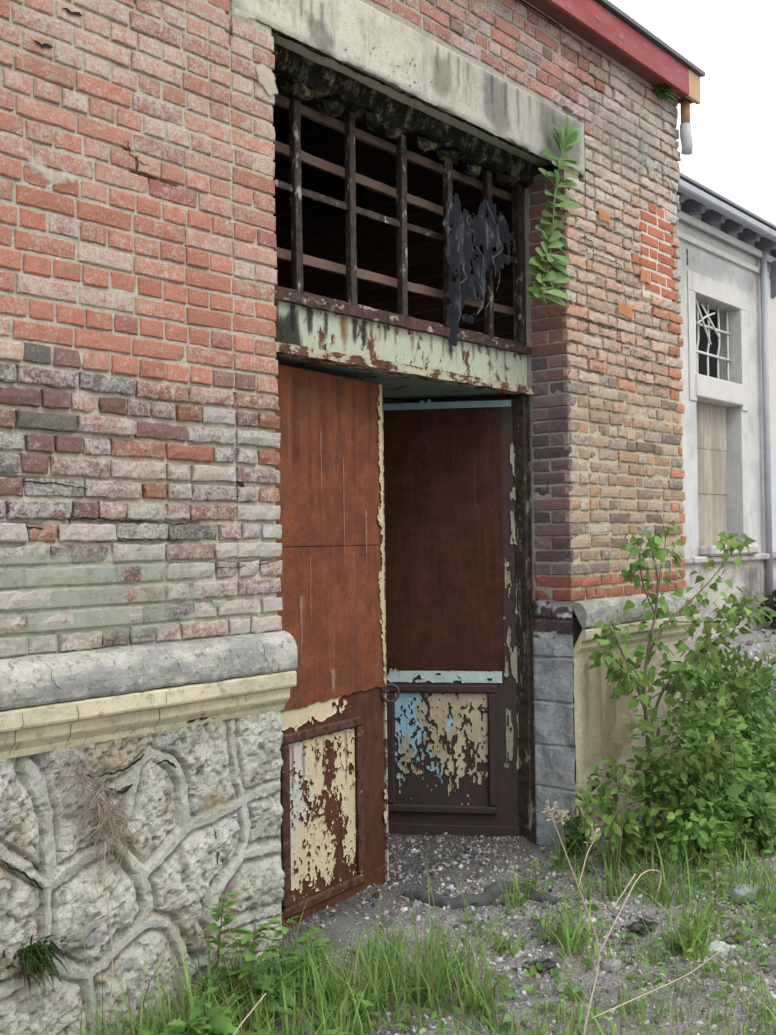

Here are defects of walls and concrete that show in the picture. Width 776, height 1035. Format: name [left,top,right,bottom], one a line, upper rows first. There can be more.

crack [520,0,561,28]
crack [127,142,178,187]
crack [15,479,88,490]
crack [0,511,199,541]
peeling [377,384,519,823]
crack [83,754,177,794]
peeling [281,697,356,900]